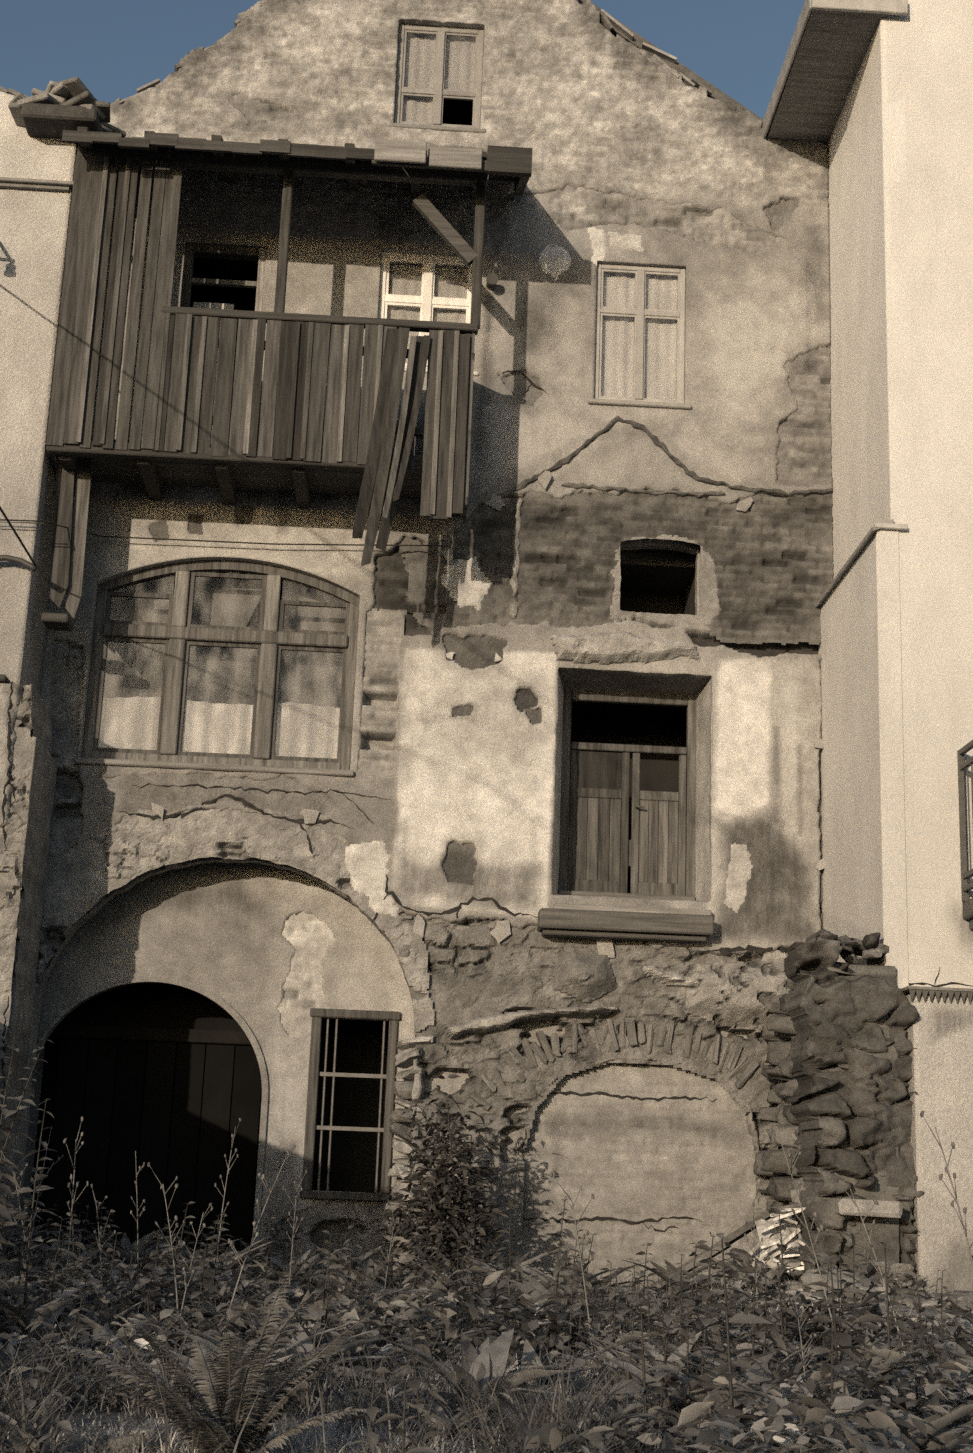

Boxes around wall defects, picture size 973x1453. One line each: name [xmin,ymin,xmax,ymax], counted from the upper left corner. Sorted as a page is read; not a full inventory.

flaking render [504,185,798,254]
flaking render [358,346,833,773]
crack [119,783,383,854]
flaking render [0,685,33,1047]
flaking render [35,640,796,1283]
crack [536,1091,717,1102]
crack [524,1216,702,1232]